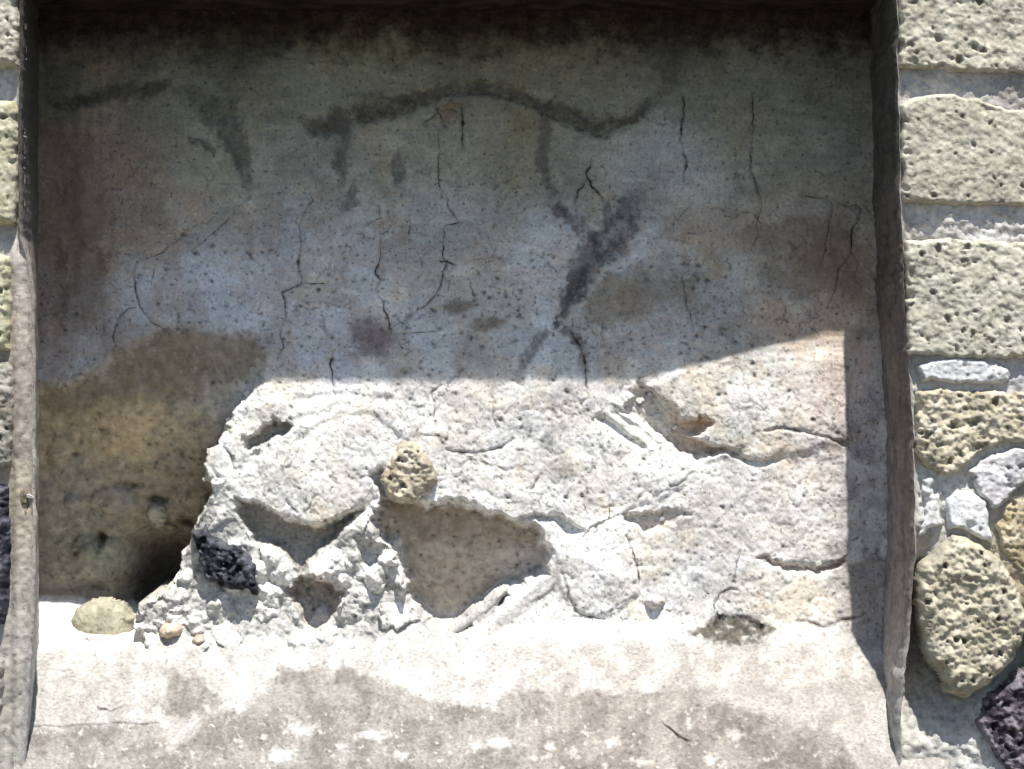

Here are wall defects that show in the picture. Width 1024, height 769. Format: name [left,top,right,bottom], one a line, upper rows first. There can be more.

crack [425,106,474,303]
crack [576,166,601,198]
crack [679,98,687,180]
crack [112,245,170,343]
crack [375,243,431,349]
leakage [543,198,640,343]
crack [573,336,587,404]
spalling [617,376,731,464]
spalling [231,493,556,640]
spalling [620,505,696,537]
spalling [755,553,850,577]
spalling [684,606,774,646]